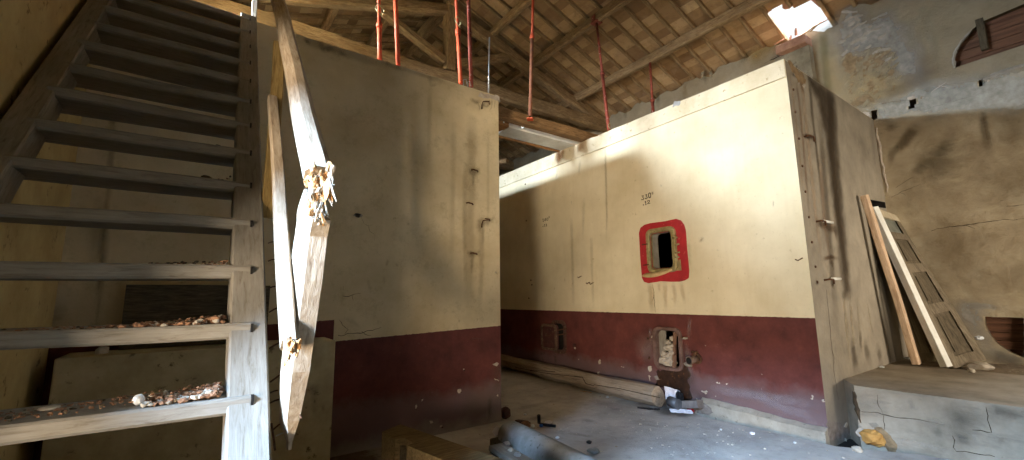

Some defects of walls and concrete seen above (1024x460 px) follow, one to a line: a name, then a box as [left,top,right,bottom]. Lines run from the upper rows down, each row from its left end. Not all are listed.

peeling [838,10,916,117]
crack [932,200,1018,231]
crack [827,301,995,457]